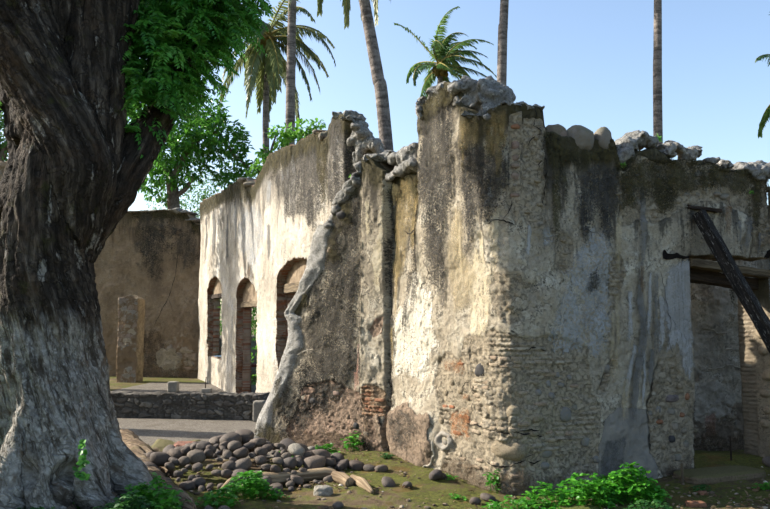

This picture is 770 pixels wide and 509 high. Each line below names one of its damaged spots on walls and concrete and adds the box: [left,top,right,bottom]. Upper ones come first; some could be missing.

damp [226,95,513,452]
spalling [434,111,617,495]
damp [543,128,770,355]
damp [625,260,694,413]
peeling [708,286,738,326]
spalling [286,380,390,452]
spalling [646,356,736,476]